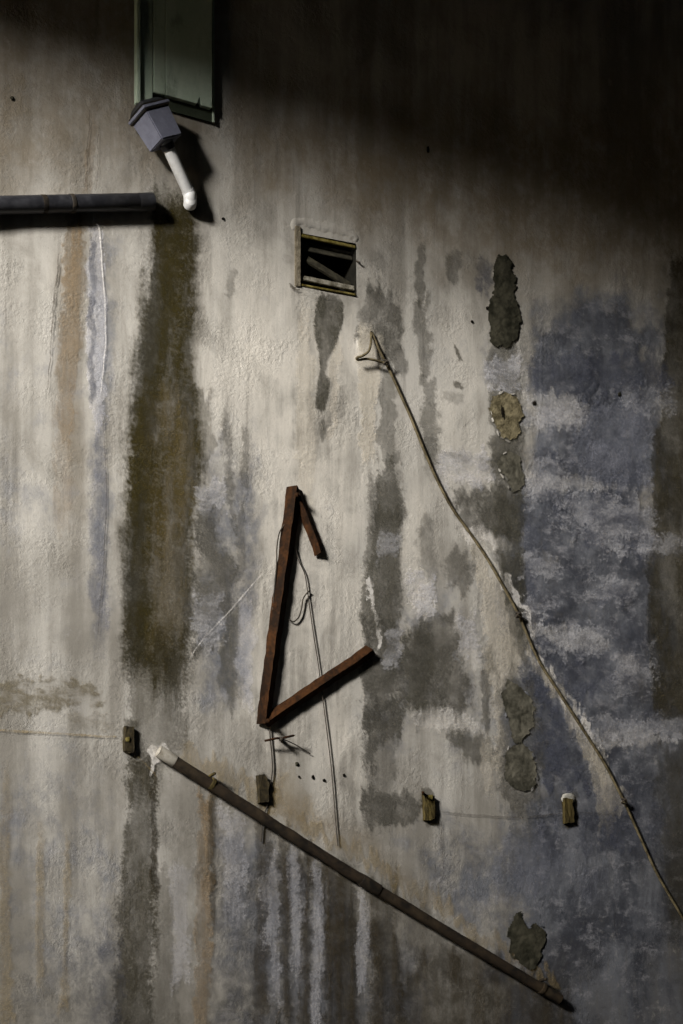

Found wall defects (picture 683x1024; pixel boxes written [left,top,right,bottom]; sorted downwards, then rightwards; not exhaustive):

damp [314,295,343,411]
flaking render [488,254,522,348]
damp [118,196,238,692]
flaking render [488,391,525,492]
damp [574,257,683,719]
damp [125,757,159,813]
flaking render [501,679,539,792]
damp [113,822,157,1024]
damp [283,846,403,1024]
flaking render [507,911,546,970]